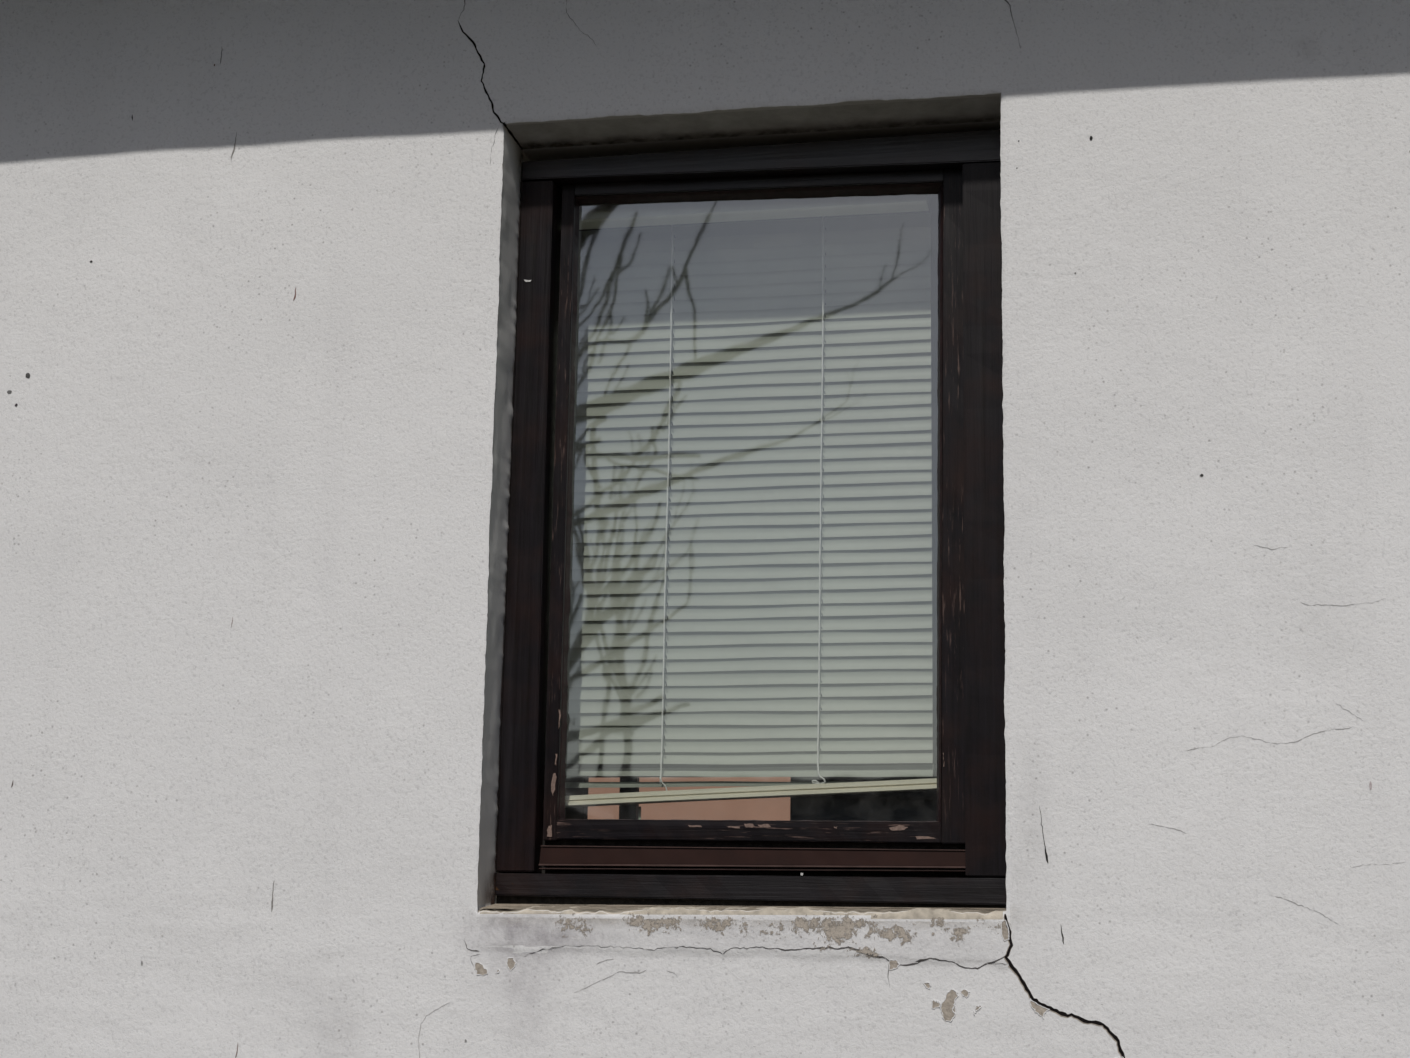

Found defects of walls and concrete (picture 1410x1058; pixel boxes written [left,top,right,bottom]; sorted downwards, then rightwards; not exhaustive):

crack [458,0,523,163]
peeling [556,913,593,937]
peeling [622,911,1009,970]
crack [525,914,1125,1058]
flaking render [923,982,982,1022]